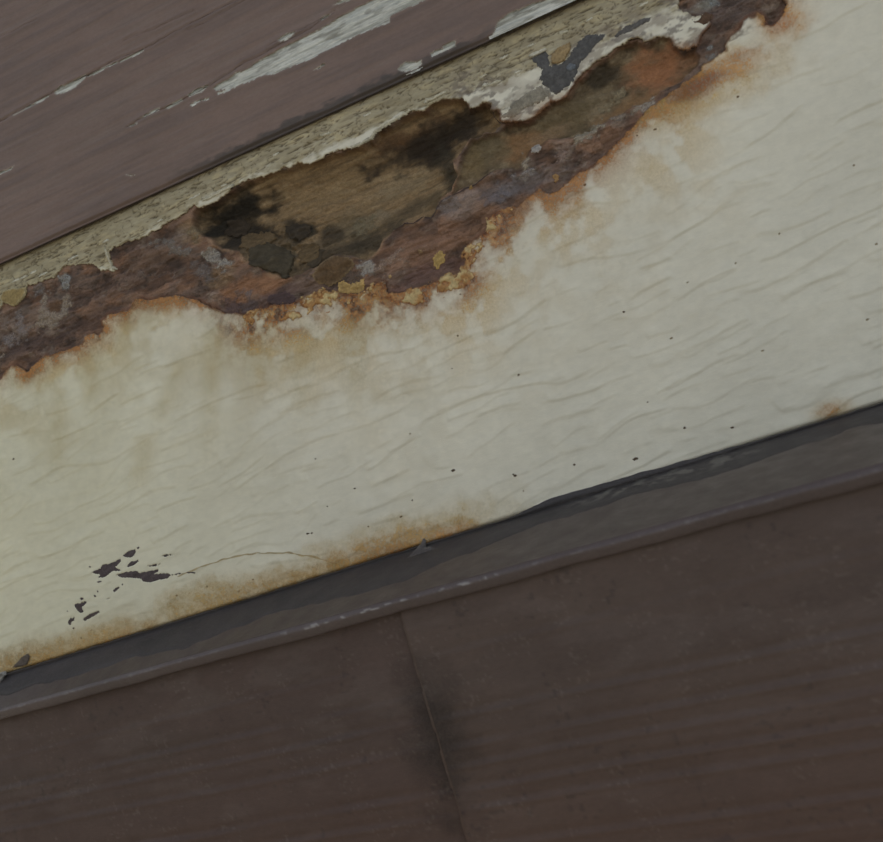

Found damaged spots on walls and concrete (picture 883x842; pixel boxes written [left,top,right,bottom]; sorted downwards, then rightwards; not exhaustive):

peeling [489,0,575,39]
peeling [694,12,713,25]
peeling [144,0,424,118]
peeling [431,41,455,57]
peeling [527,17,651,95]
peeling [25,49,144,109]
water stain [501,85,551,118]
peeling [433,251,446,269]
peeling [267,291,296,305]
peeling [338,278,365,294]
water stain [178,551,341,577]
peeling [67,546,195,639]